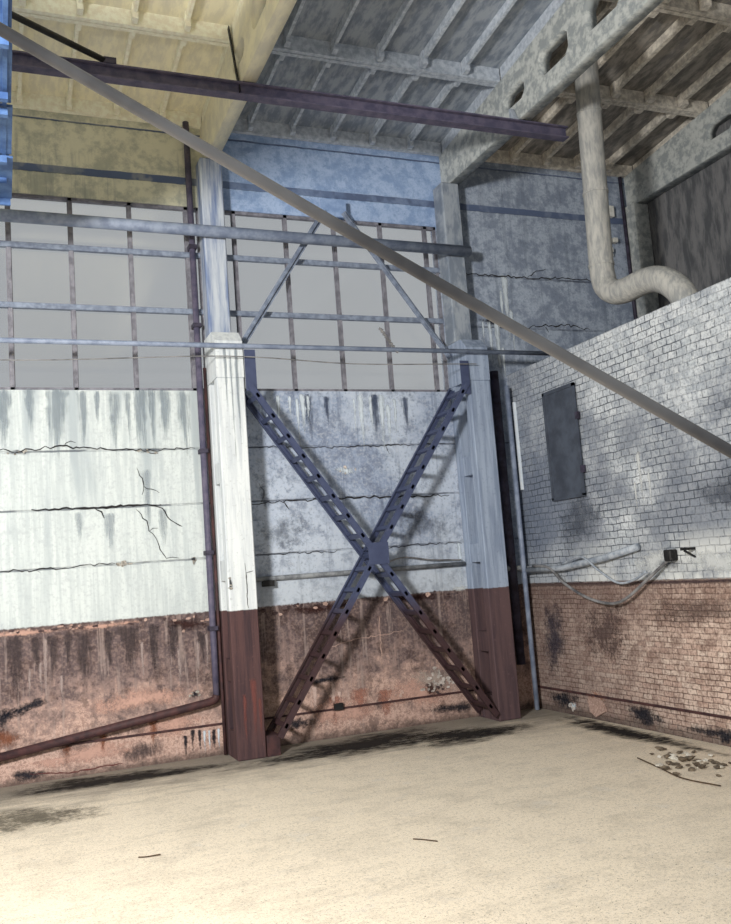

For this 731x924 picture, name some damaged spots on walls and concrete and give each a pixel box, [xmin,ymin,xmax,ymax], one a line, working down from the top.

crack [466,269,590,281]
water stain [0,391,9,428]
water stain [48,389,64,441]
water stain [80,392,99,431]
water stain [110,391,169,430]
water stain [178,392,187,438]
water stain [262,394,313,436]
water stain [353,394,408,446]
crack [0,441,192,559]
crack [1,563,115,573]
water stain [586,606,621,658]
water stain [5,633,90,716]